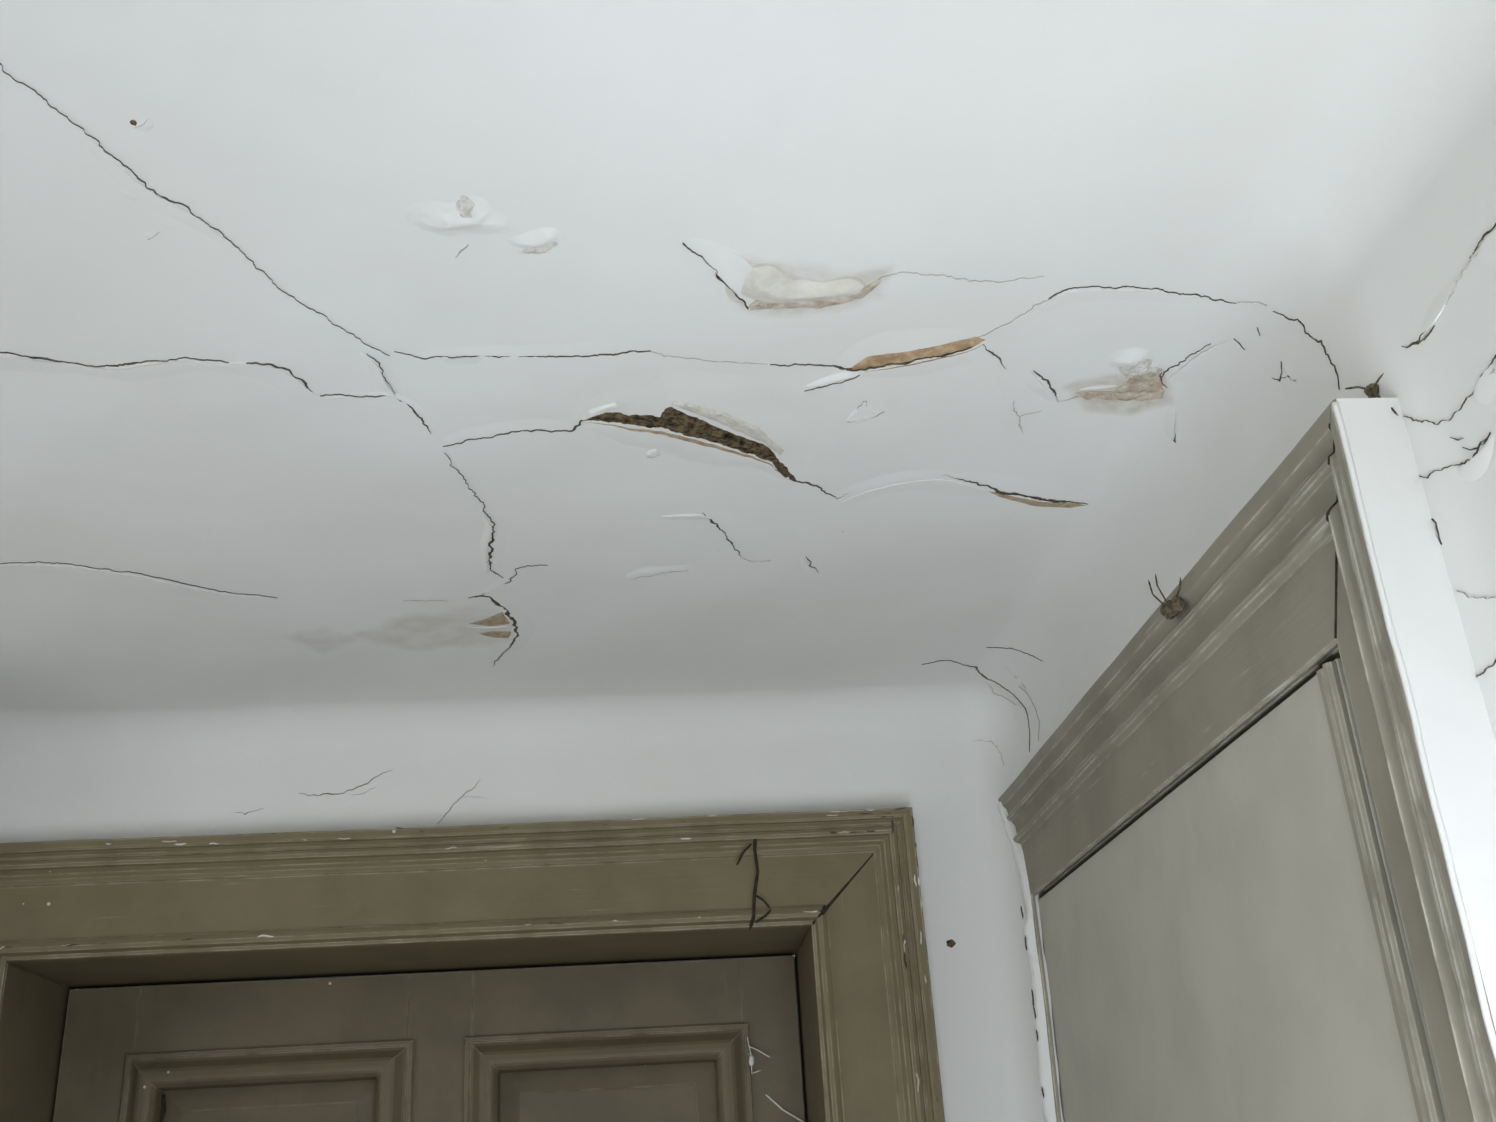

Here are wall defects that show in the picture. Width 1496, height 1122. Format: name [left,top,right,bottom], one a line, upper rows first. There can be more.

crack [1402,223,1496,348]
crack [0,63,1340,667]
spalling [1077,340,1239,401]
crack [1405,355,1496,482]
crack [1431,518,1443,550]
spalling [464,612,511,638]